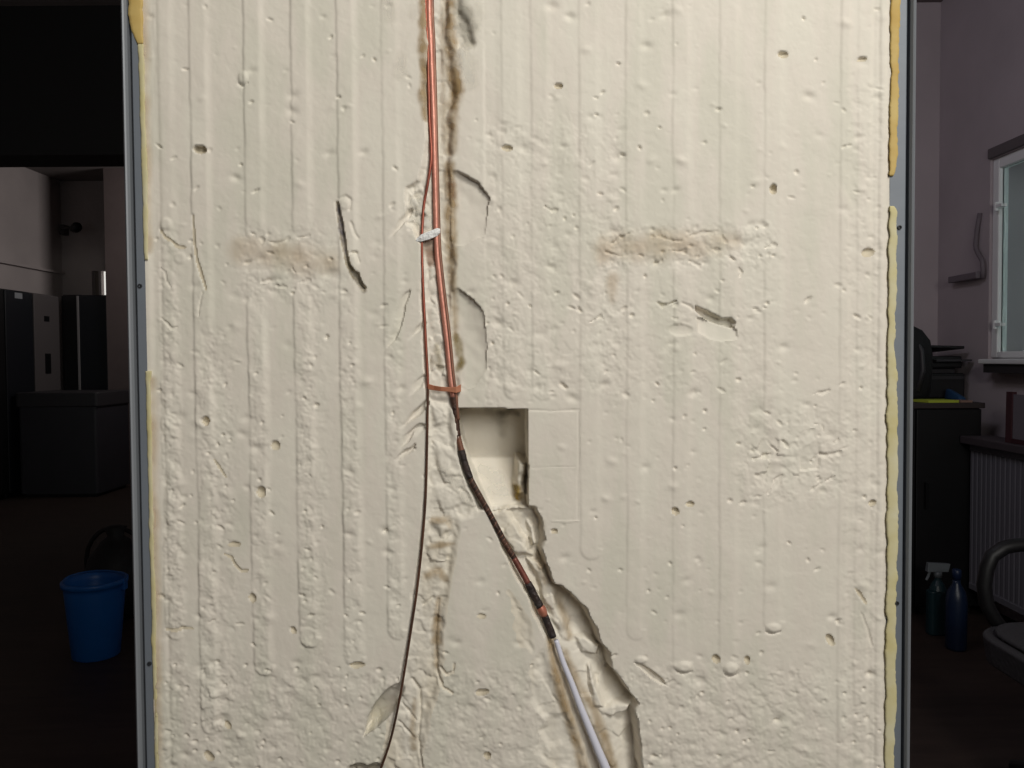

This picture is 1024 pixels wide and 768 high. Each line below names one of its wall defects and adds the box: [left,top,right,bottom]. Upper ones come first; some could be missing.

leakage [446,0,472,131]
leakage [446,163,456,260]
spalling [350,0,644,768]
spalling [695,306,739,342]